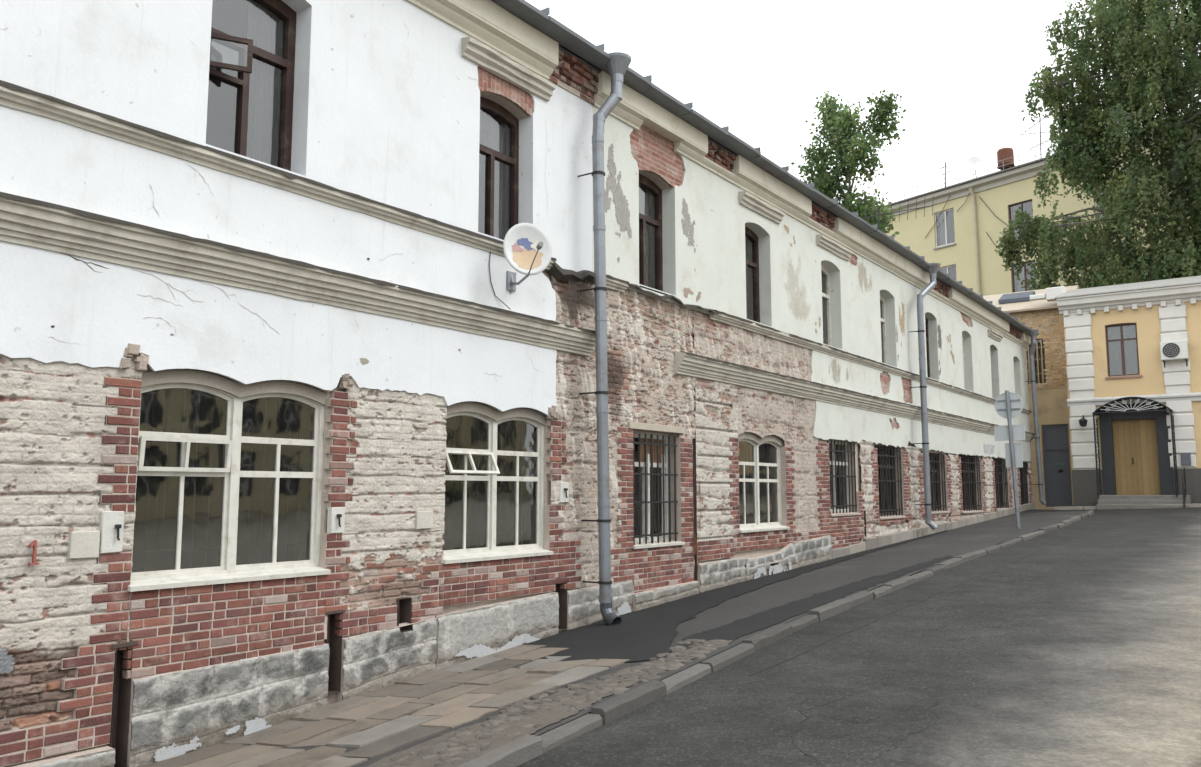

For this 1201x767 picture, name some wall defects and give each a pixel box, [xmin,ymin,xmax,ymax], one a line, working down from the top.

flaking render [477,66,533,116]
peeling [604,143,632,238]
flaking render [629,125,696,253]
crack [61,253,278,336]
flaking render [549,267,820,588]
flaking render [0,354,143,732]
flaking render [339,377,447,611]